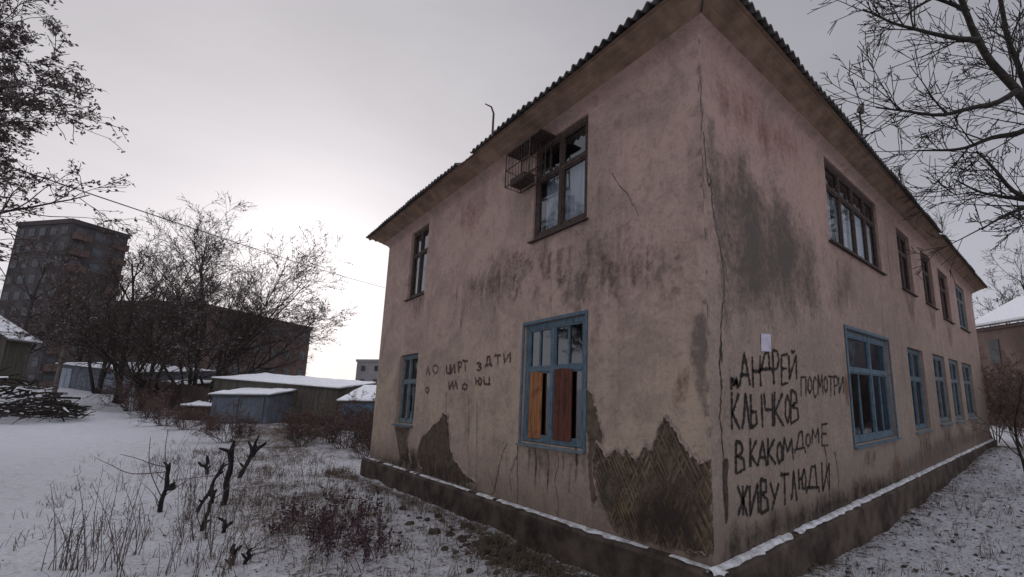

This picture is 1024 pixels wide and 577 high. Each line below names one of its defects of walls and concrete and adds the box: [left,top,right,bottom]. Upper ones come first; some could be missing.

spalling [586,387,729,558]